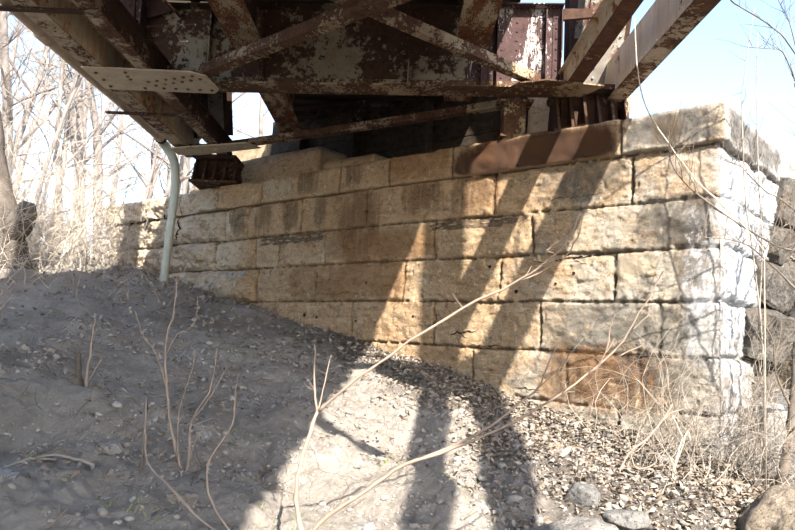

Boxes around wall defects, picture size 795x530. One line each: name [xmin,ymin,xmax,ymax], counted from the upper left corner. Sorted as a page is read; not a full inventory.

rust [455,125,613,174]
crack [530,254,606,269]